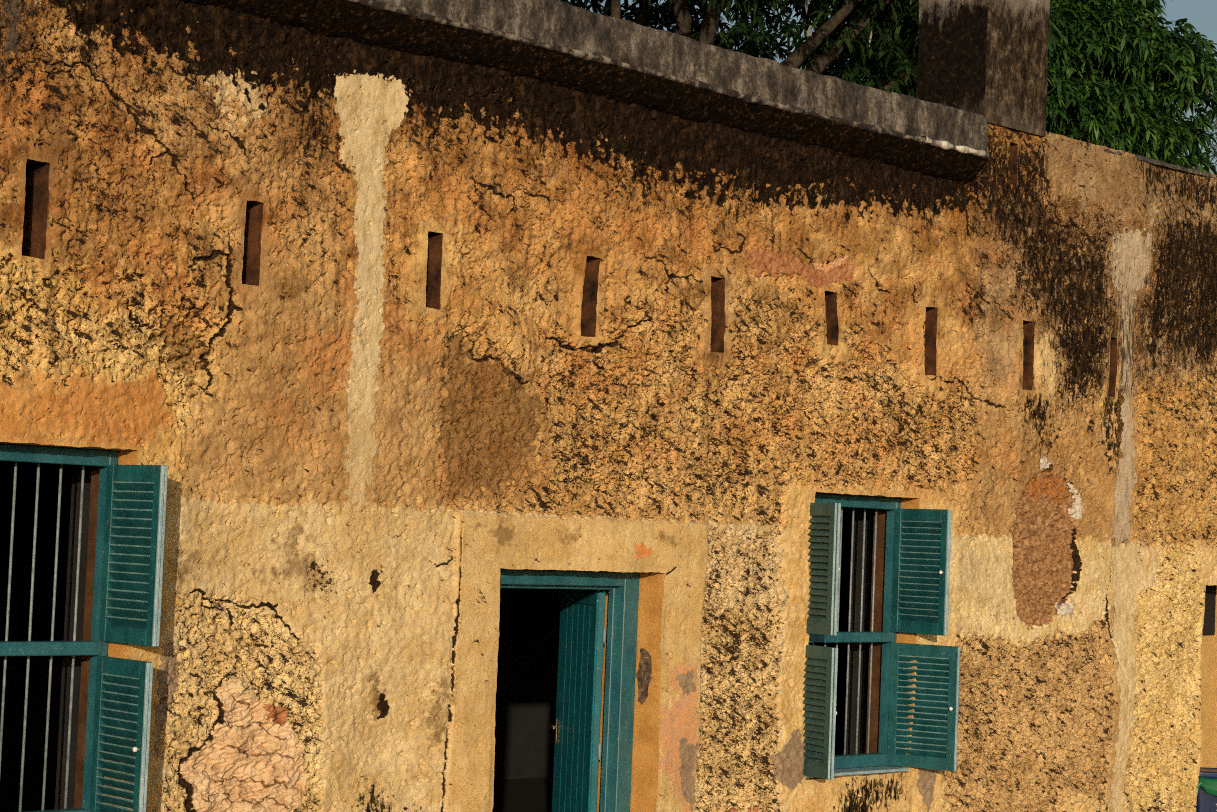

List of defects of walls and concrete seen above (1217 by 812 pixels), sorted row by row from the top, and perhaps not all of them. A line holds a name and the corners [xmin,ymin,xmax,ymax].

crack [3,58,195,221]
crack [208,124,249,164]
crack [126,300,150,327]
crack [188,233,243,387]
leakage [1016,385,1059,455]
flaking render [1012,455,1084,630]
leakage [369,570,381,593]
flaking render [176,673,310,812]
leakage [377,693,390,720]
peeling [636,648,652,705]
peeling [659,650,701,812]
leakage [833,773,907,812]